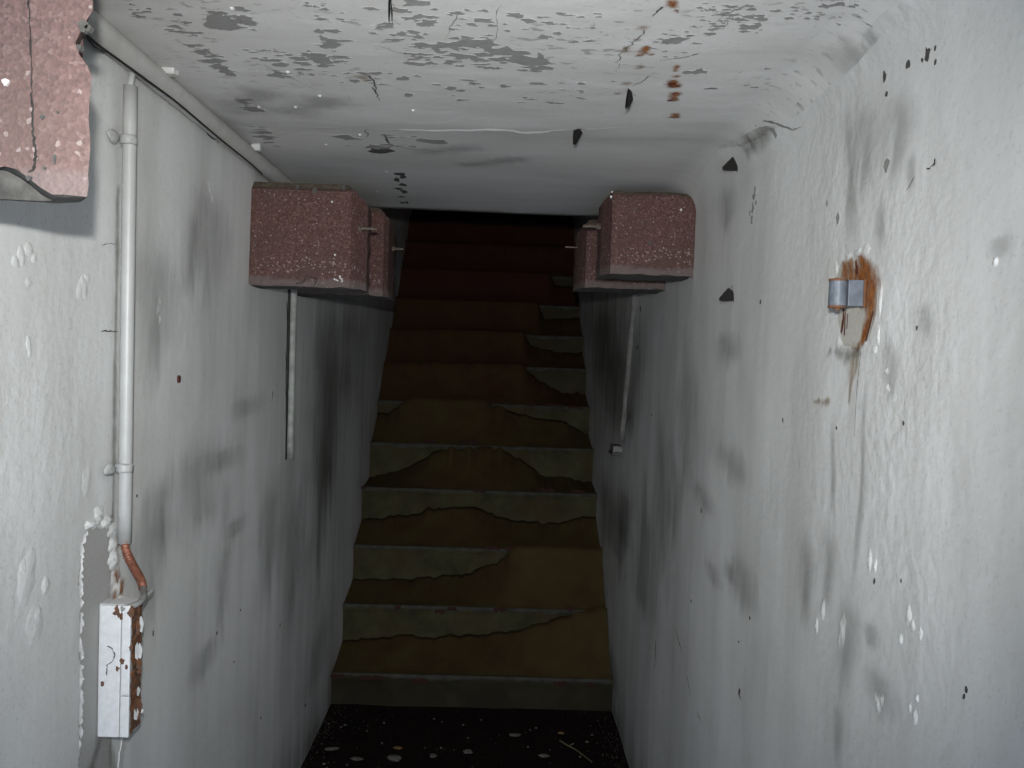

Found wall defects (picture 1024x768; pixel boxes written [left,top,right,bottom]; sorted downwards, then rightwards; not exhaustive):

crack [27,0,37,172]
peeling [242,0,602,104]
rust [667,65,681,101]
peeling [329,134,448,154]
rust [827,256,876,367]
rust [112,571,135,620]